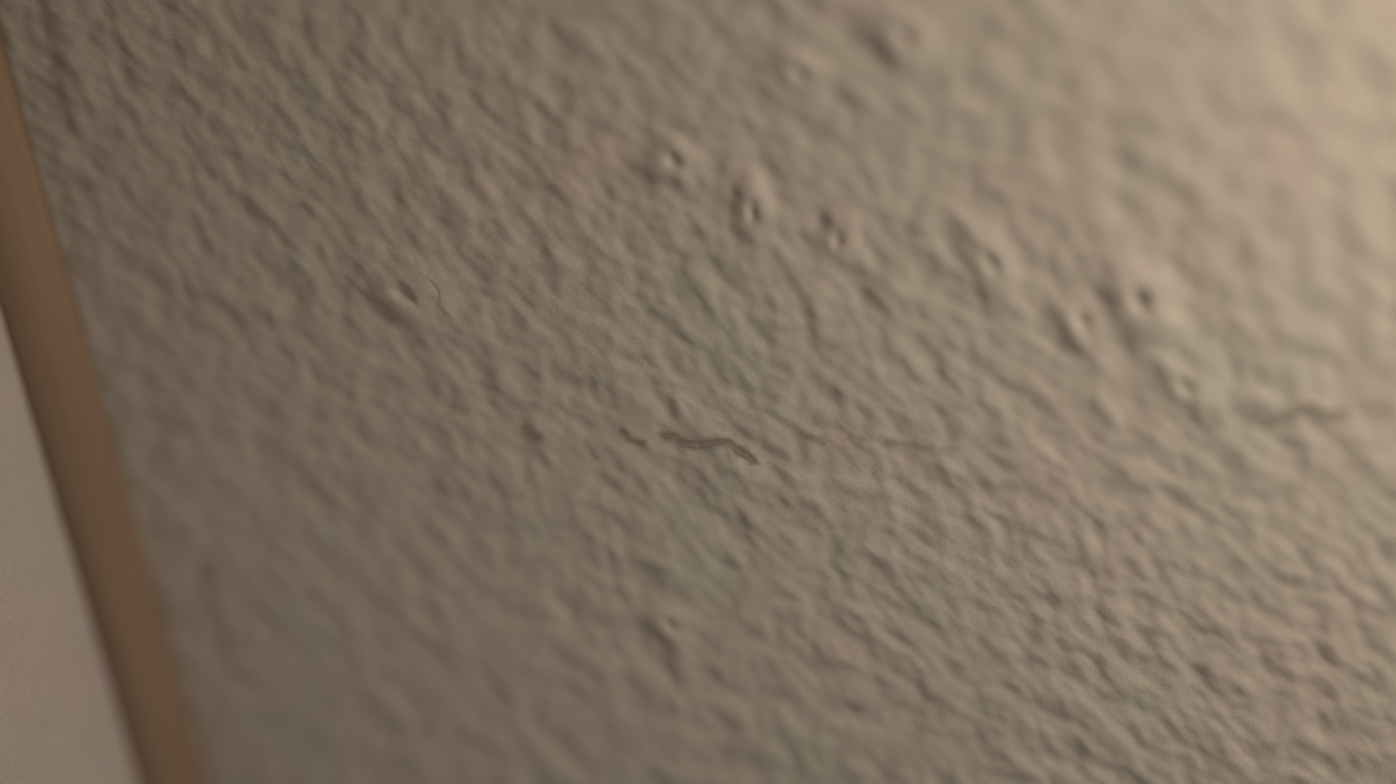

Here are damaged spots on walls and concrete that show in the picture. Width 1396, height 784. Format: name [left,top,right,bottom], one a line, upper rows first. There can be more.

crack [621,429,757,463]